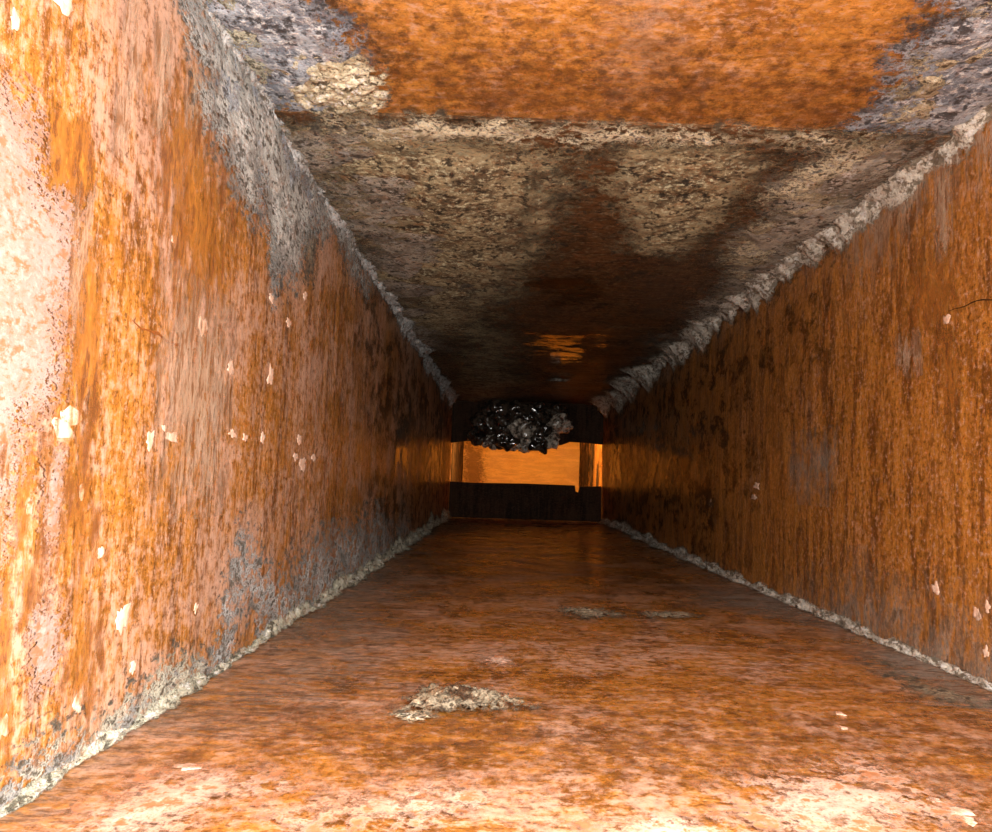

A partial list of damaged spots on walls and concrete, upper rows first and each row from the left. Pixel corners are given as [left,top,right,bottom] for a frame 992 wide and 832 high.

rust [321,0,397,61]
rust [150,40,239,502]
peeling [199,316,209,336]
peeling [214,349,235,375]
rust [0,103,110,775]
peeling [146,425,178,452]
peeling [293,434,316,472]
peeling [115,602,131,636]
peeling [973,599,991,621]
spalling [388,682,540,724]
rust [243,707,992,799]